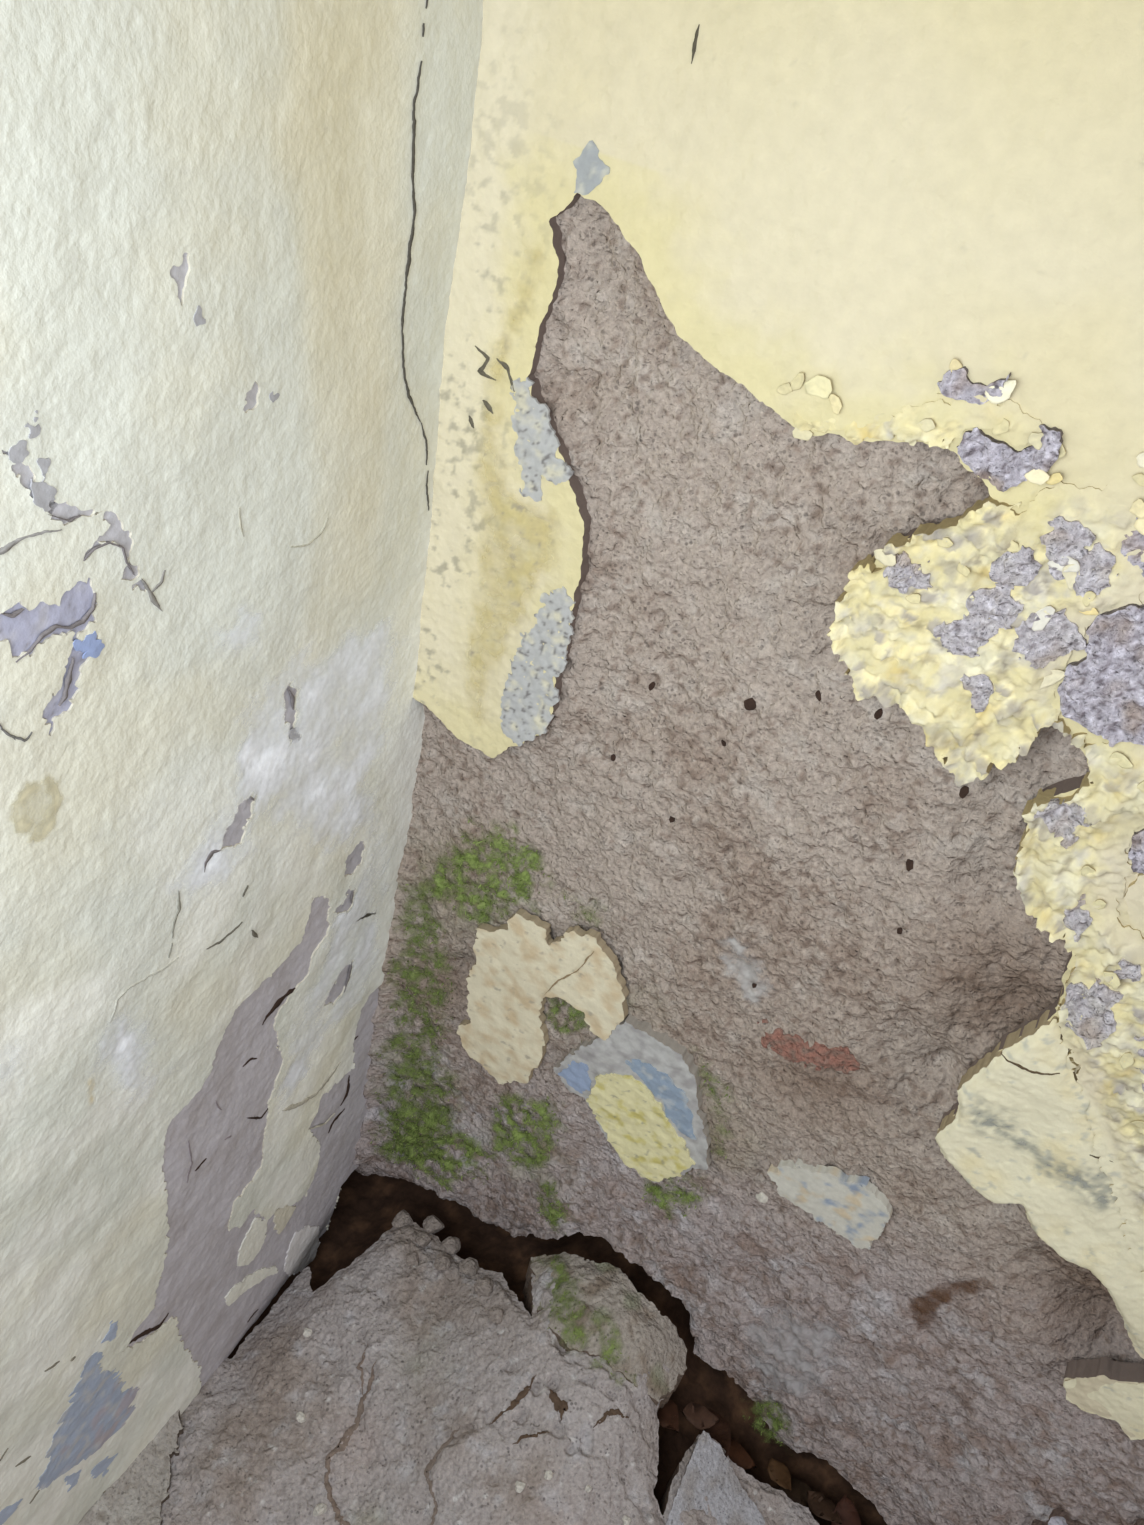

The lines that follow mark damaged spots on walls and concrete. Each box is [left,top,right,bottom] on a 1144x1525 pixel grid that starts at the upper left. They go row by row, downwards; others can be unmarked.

crack [401,0,429,511]
spalling [573,140,610,195]
spalling [0,410,145,734]
spalling [128,196,1144,1525]
crack [227,1170,887,1525]